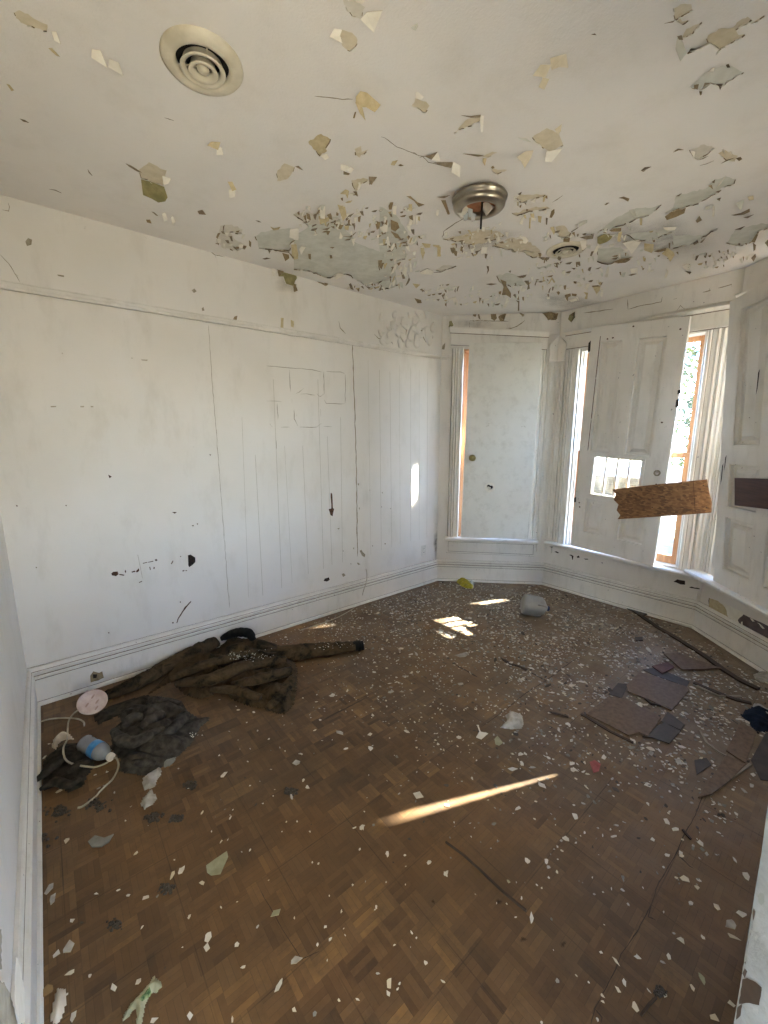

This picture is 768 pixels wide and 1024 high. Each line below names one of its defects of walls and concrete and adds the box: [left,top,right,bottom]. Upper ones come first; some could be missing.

peeling [664,4,765,95]
peeling [309,134,331,160]
crack [383,137,441,166]
peeling [127,163,176,225]
peeling [215,144,768,322]
crack [339,323,433,557]
peeling [708,598,768,638]